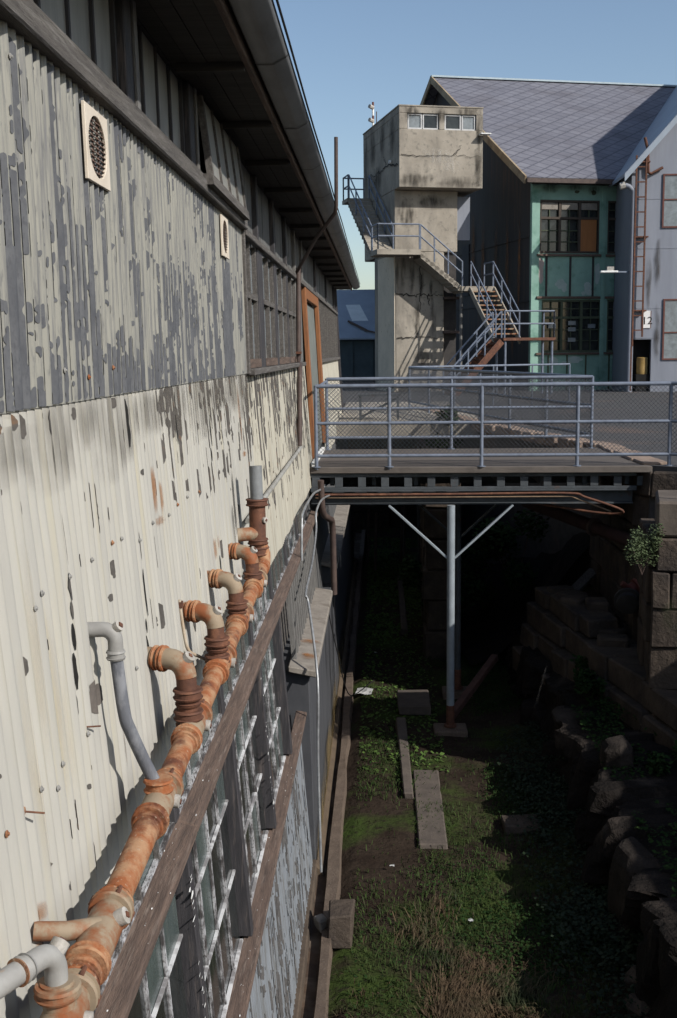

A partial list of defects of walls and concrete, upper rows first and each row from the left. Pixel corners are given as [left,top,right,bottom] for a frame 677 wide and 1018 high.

crack [372,145,480,188]
peeling [0,35,310,518]
peeling [150,600,165,629]
peeling [89,680,103,714]
peeling [239,767,311,1018]